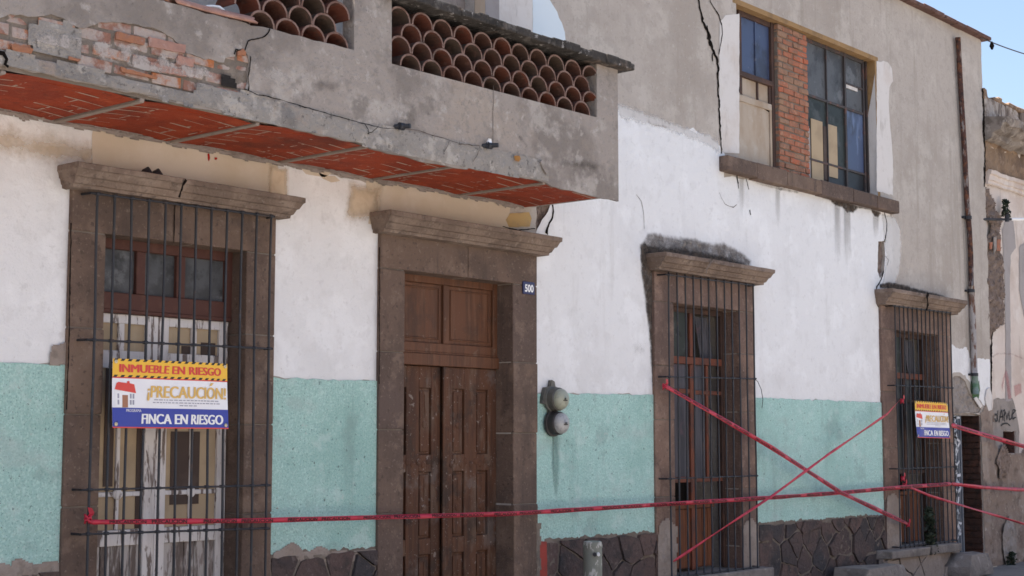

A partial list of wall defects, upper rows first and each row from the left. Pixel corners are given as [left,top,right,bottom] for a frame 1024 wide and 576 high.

spalling [10,20,82,62]
spalling [115,31,195,80]
hole [221,74,237,89]
crack [698,0,723,154]
crack [173,179,187,242]
spalling [985,187,1006,340]